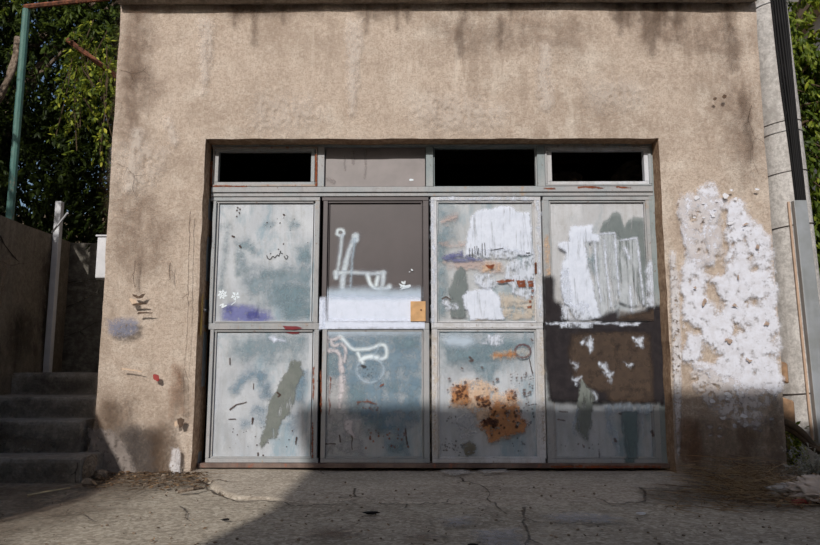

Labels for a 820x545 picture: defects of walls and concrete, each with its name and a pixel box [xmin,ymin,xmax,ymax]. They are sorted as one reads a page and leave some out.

peeling [677,182,784,438]
rust [447,378,531,443]
water stain [119,426,159,474]
crack [189,477,555,545]